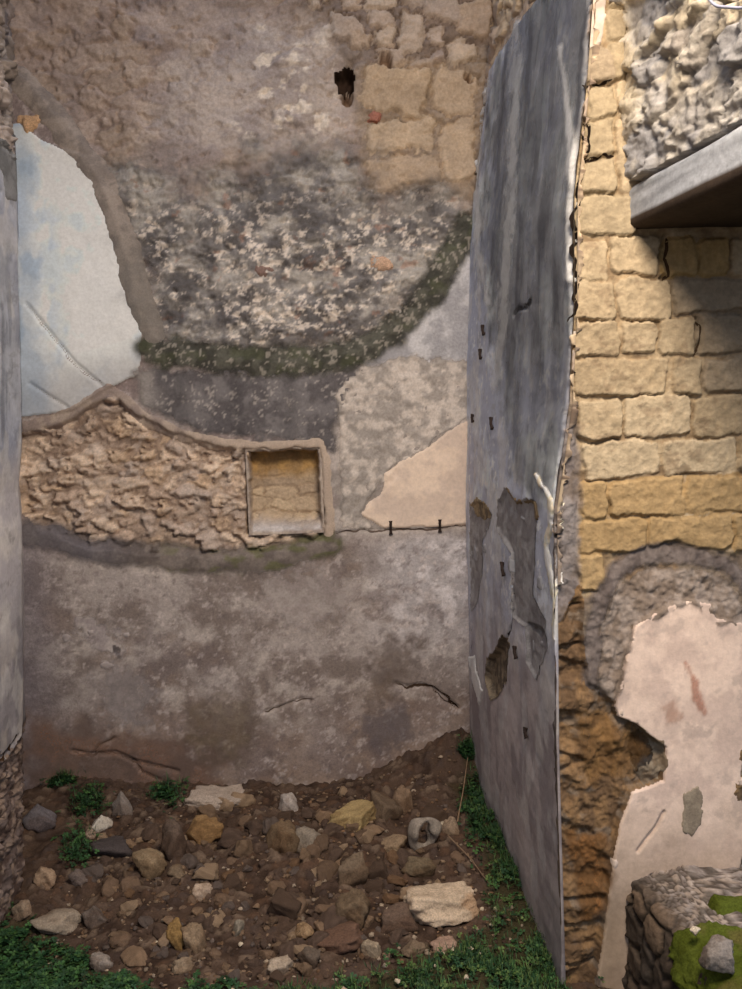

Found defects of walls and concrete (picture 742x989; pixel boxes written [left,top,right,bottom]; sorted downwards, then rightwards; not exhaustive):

crack [582,79,612,88]
crack [567,118,614,322]
flaking render [11,66,472,633]
flaking render [0,719,26,923]
crack [395,683,459,708]
flaking render [468,472,742,984]